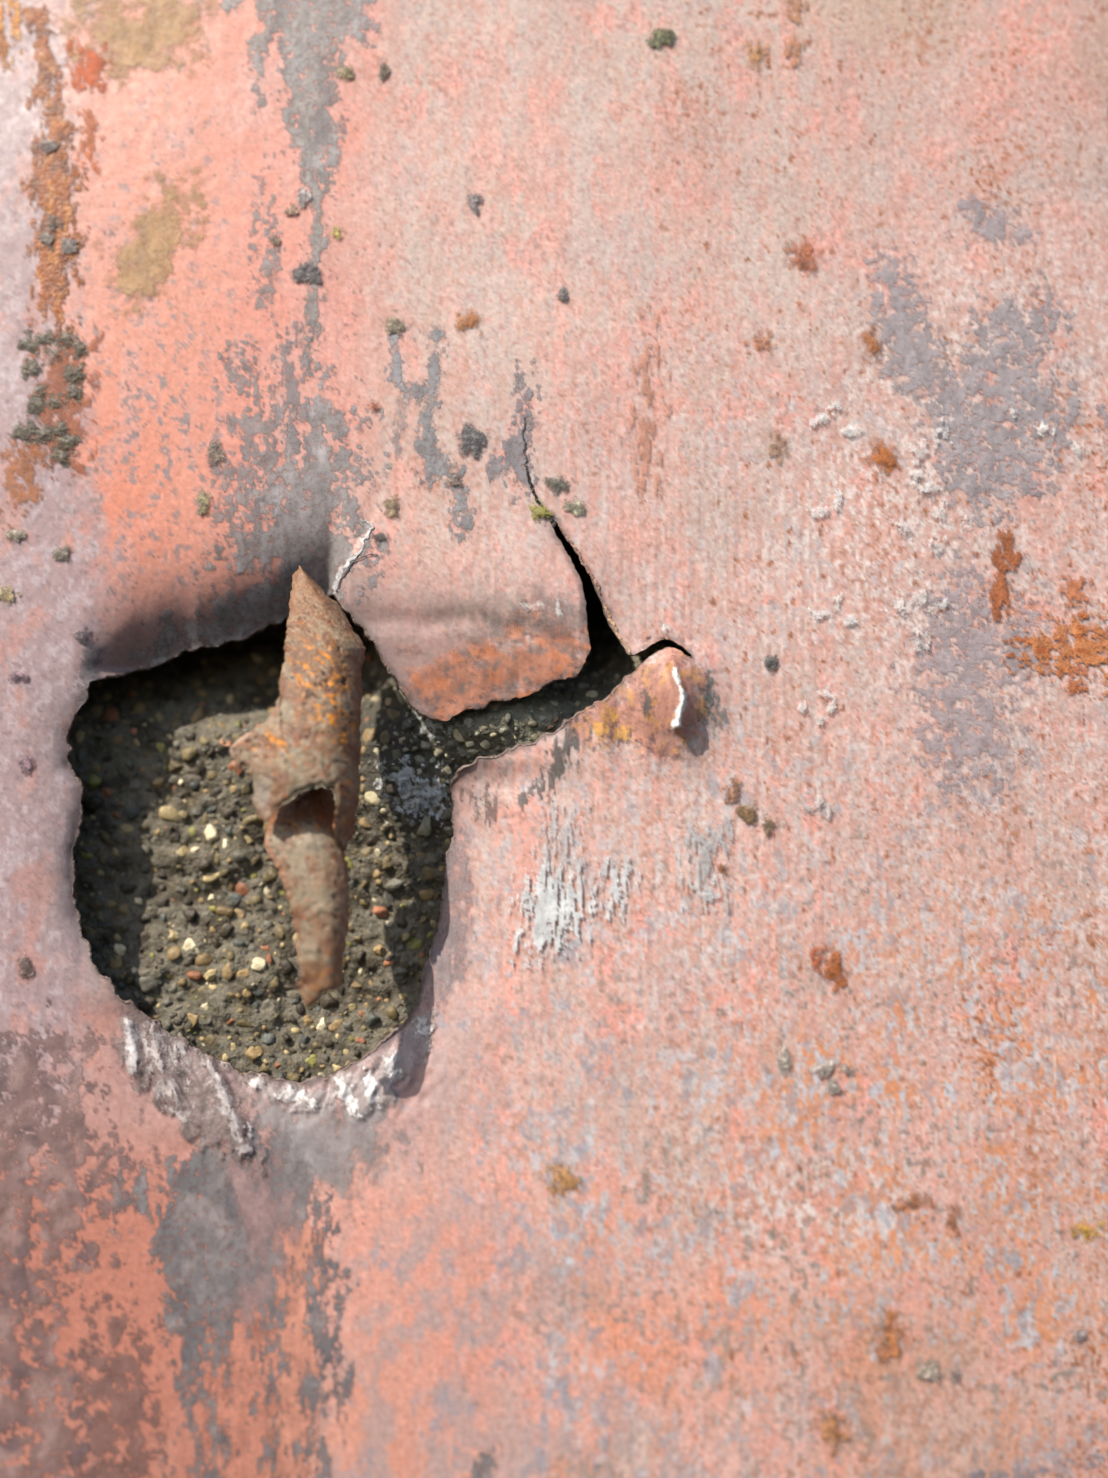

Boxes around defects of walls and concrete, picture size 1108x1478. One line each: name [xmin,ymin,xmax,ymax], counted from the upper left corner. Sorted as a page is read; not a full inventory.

corrosion [0,0,106,529]
peeling [73,627,105,711]
peeling [129,0,585,666]
crack [522,417,631,654]
peeling [863,190,1108,817]
corrosion [981,519,1108,695]
peeling [432,844,473,1005]
peeling [0,999,409,1478]